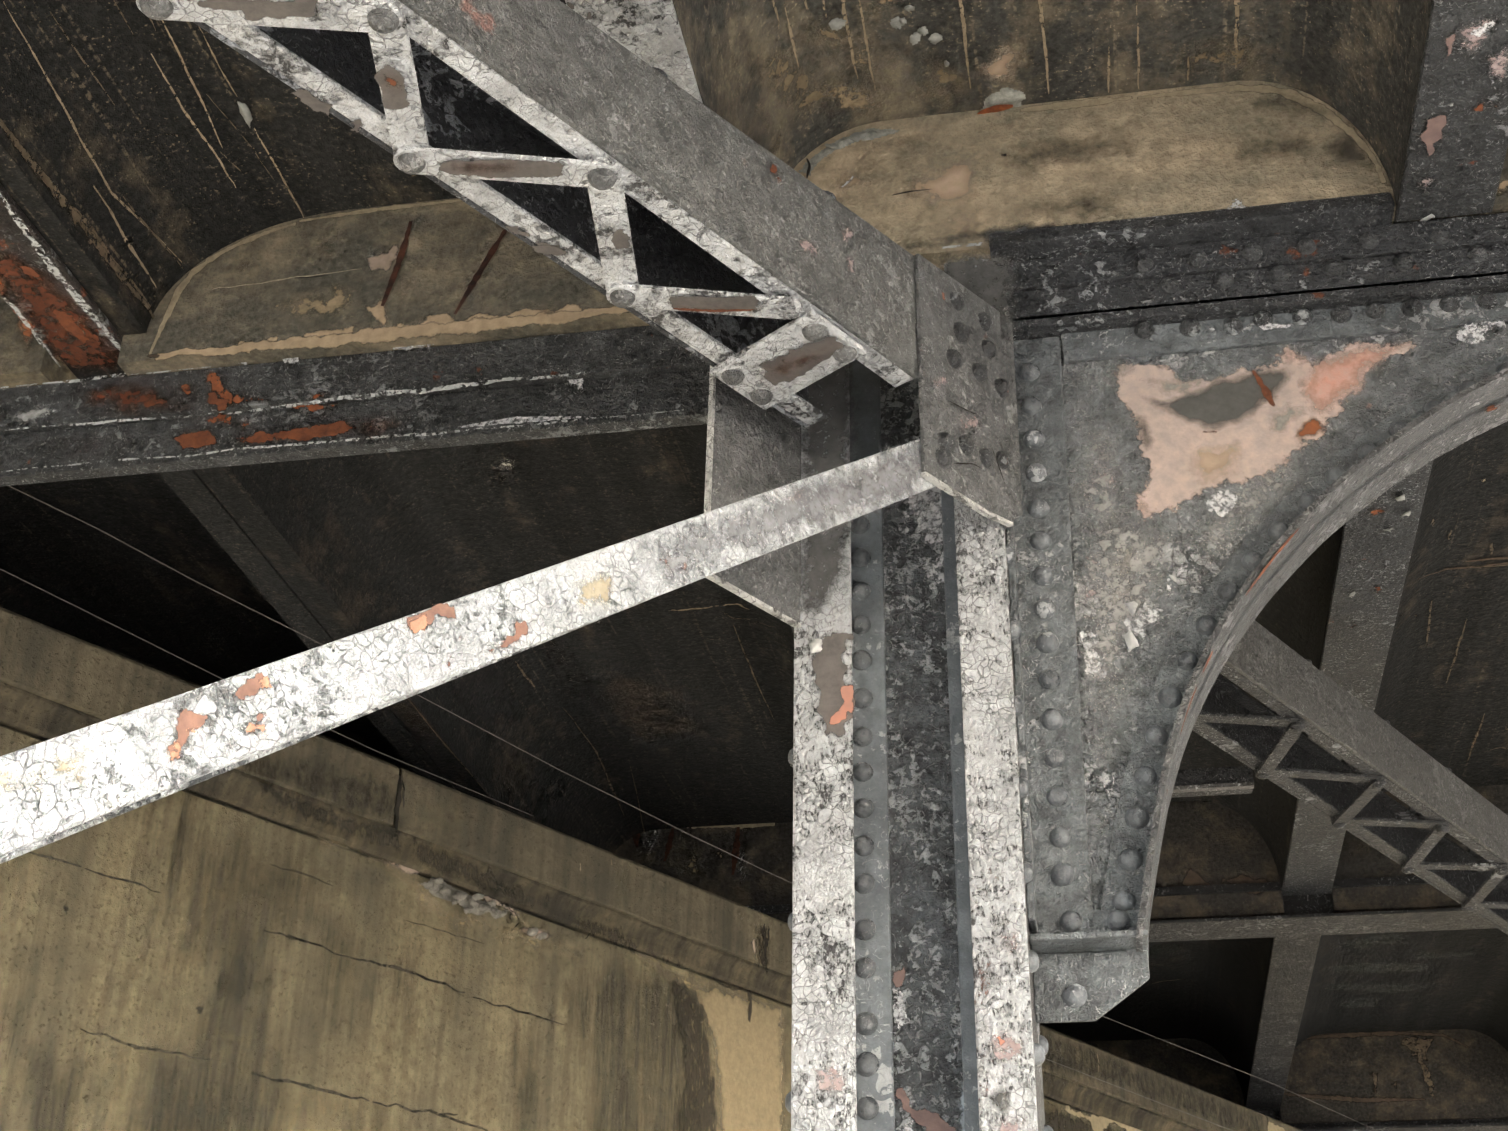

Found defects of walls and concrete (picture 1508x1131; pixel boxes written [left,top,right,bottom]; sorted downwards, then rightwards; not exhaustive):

peeling [876,0,943,63]
peeling [1445,20,1508,78]
peeling [1420,103,1453,157]
corrosion [0,255,118,369]
peeling [1456,301,1508,344]
corrosion [87,371,391,450]
peeling [1079,340,1417,700]
spalling [371,859,549,946]
crack [80,1028,211,1060]
crack [263,930,564,1025]
peeling [892,968,910,1050]
crack [259,1075,488,1131]